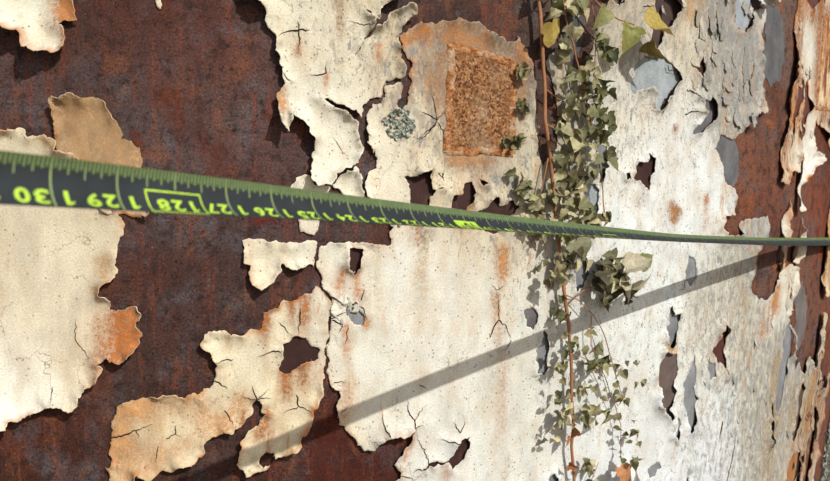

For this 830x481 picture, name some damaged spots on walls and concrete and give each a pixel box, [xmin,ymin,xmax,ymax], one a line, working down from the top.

peeling [0,0,77,53]
rust [57,0,77,22]
crack [280,23,307,50]
rust [796,0,830,72]
rust [42,93,143,167]
peeling [259,0,781,238]
peeling [0,204,149,431]
crack [319,285,367,343]
peeling [105,210,830,481]
crack [215,359,309,413]
rust [109,397,153,477]
crack [401,385,430,479]